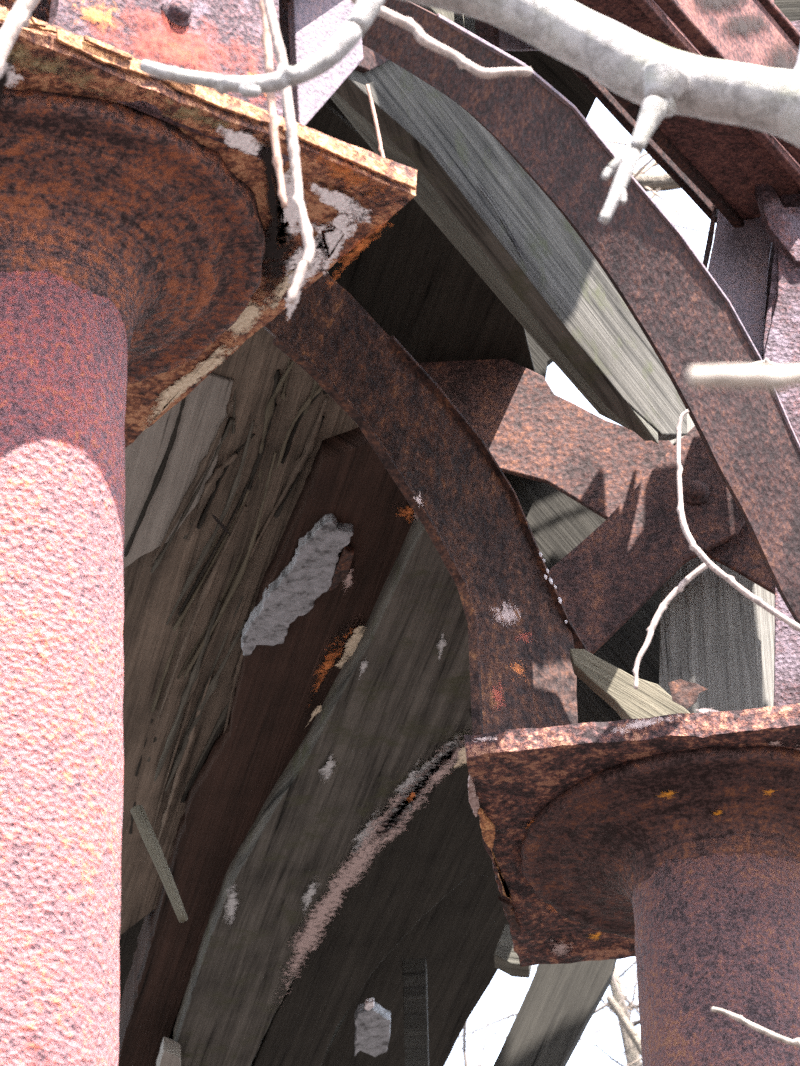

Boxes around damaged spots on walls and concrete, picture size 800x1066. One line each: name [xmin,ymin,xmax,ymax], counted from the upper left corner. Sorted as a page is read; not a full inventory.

corrosion [74,4,113,25]
corrosion [135,12,226,72]
corrosion [344,226,384,265]
spalling [241,514,354,656]
corrosion [492,603,528,640]
peeling [335,626,364,668]
corrosion [317,653,339,688]
spalling [354,998,391,1057]